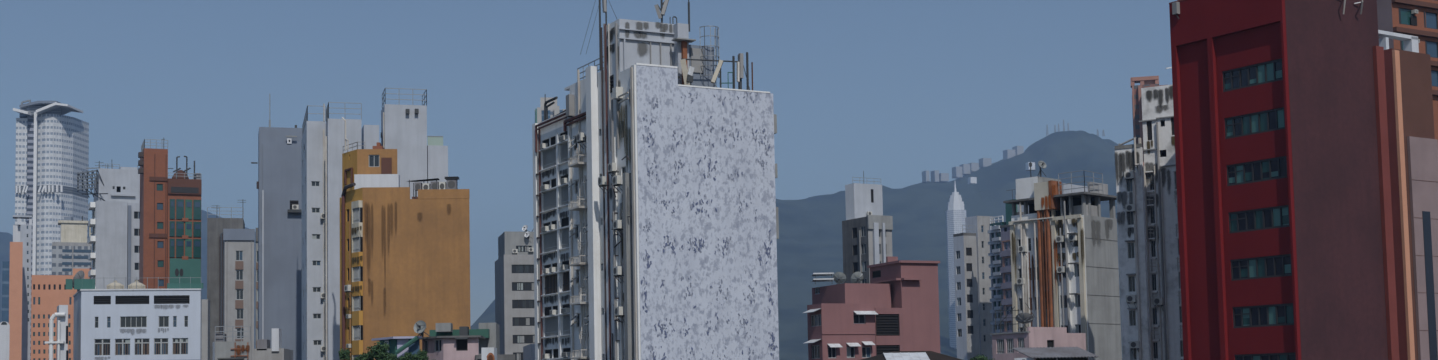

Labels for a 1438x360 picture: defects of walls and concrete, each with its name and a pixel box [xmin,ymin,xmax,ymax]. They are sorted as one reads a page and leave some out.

rust [1041,185,1056,210]
rust [1032,230,1063,306]